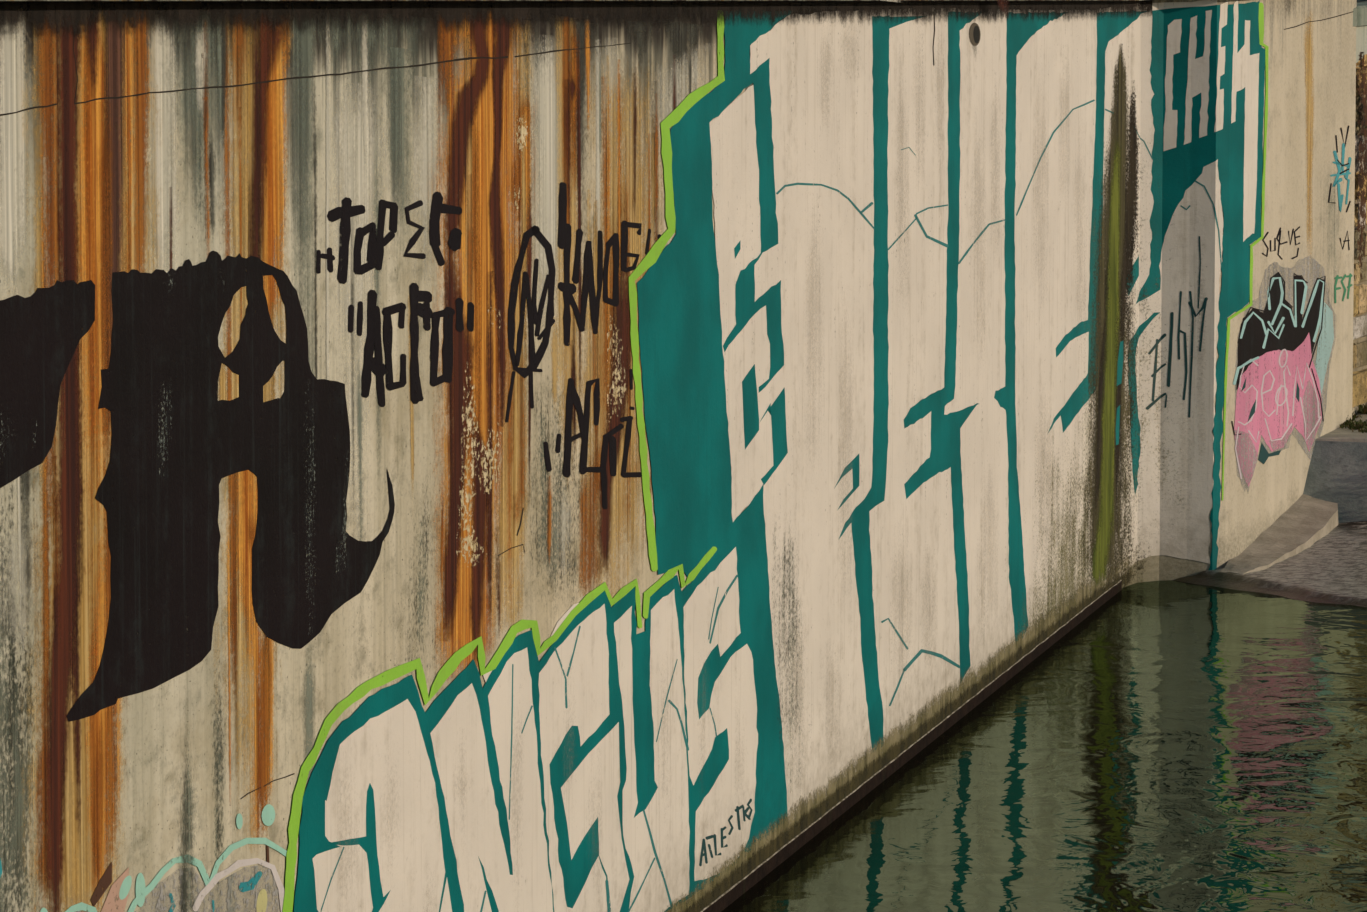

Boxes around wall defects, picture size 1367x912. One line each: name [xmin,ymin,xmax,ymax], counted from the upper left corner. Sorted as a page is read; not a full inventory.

damp [0,471,42,912]
corrosion [26,12,172,912]
corrosion [203,14,286,402]
corrosion [225,470,274,838]
damp [405,516,437,666]
corrosion [435,13,532,671]
damp [0,0,1152,601]
corrosion [552,17,676,598]
damp [666,82,1169,912]